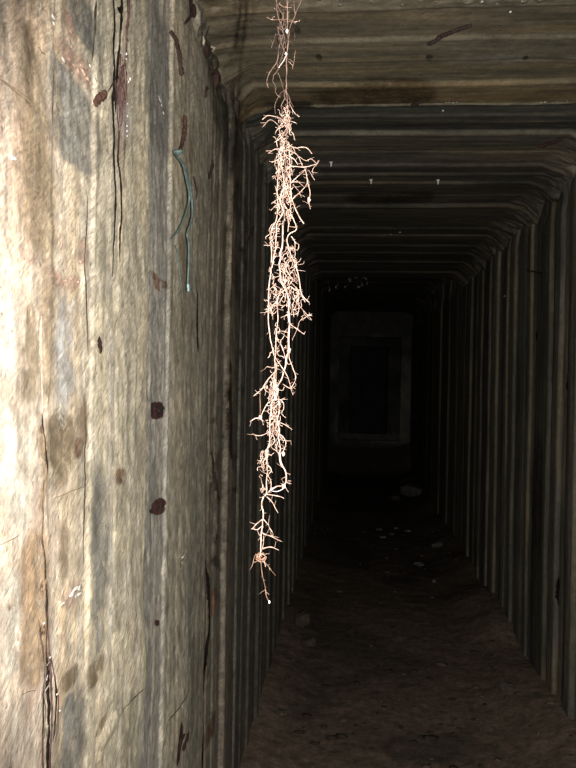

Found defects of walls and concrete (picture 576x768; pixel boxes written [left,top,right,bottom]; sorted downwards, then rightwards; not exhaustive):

rust [93,92,106,107]
crack [92,0,128,277]
crack [82,200,90,346]
crack [193,295,201,350]
rust [151,401,165,420]
rust [149,498,166,515]
crack [0,411,87,768]
crack [163,560,217,768]
rust [177,723,189,765]